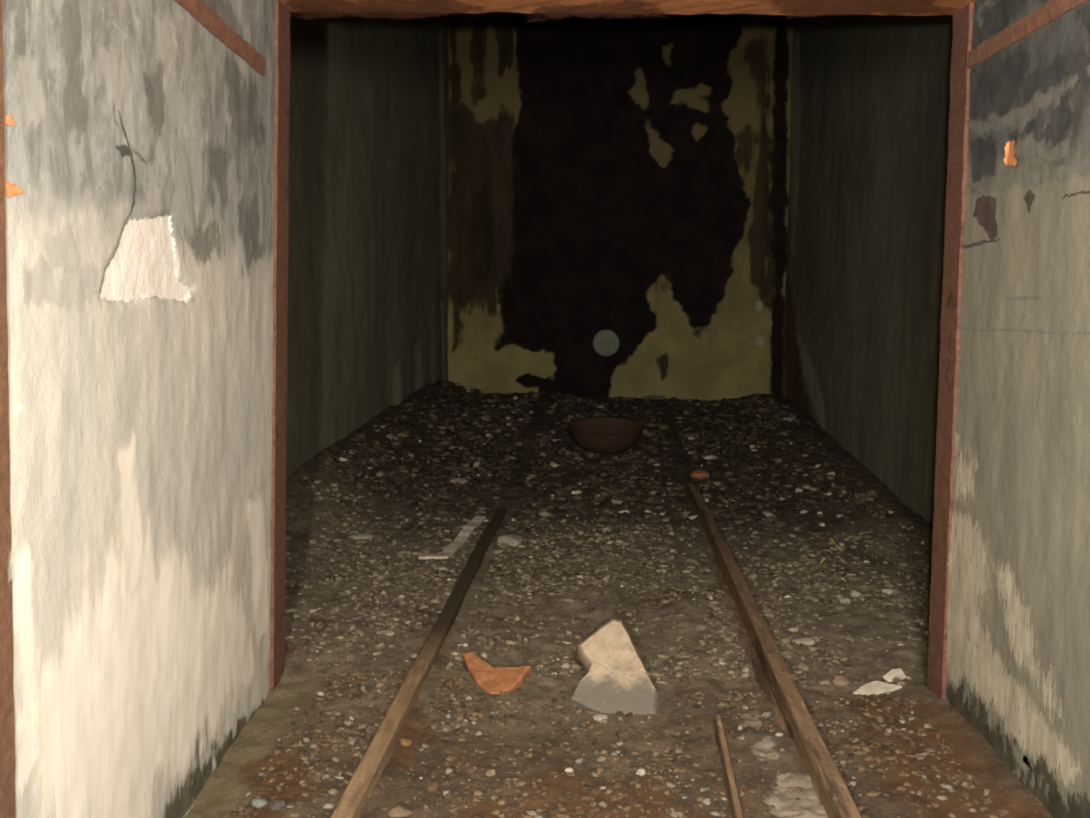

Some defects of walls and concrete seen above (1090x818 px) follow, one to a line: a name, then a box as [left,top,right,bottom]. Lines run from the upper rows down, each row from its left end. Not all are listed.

water stain [61,3,88,128]
water stain [144,66,164,133]
water stain [206,148,227,206]
water stain [226,56,266,149]
peeling [967,45,1090,240]
water stain [189,222,220,263]
water stain [239,194,262,272]
water stain [11,431,269,818]
water stain [946,432,1090,818]